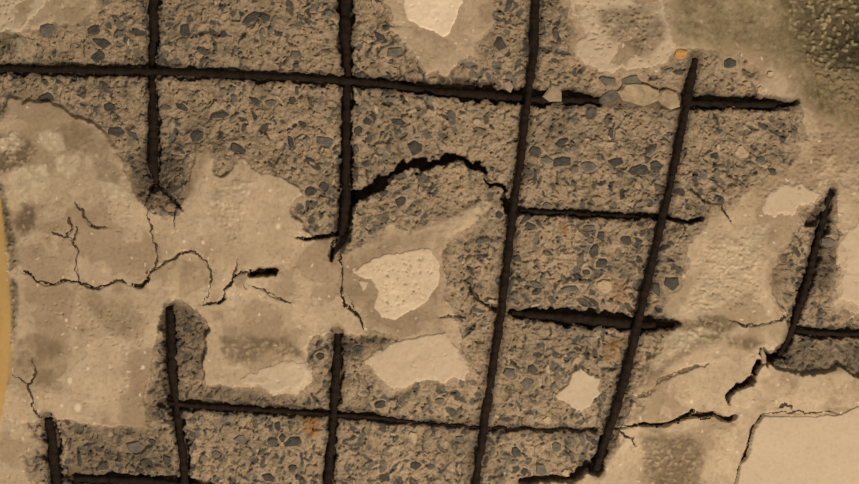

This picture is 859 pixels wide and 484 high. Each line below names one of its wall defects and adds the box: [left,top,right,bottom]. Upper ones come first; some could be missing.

damp [684,0,859,121]
crack [23,181,289,306]
spalling [0,0,525,484]
crack [295,232,364,330]
spalling [340,0,807,484]
crack [698,314,788,328]
spalling [759,188,859,378]
crack [615,359,837,478]